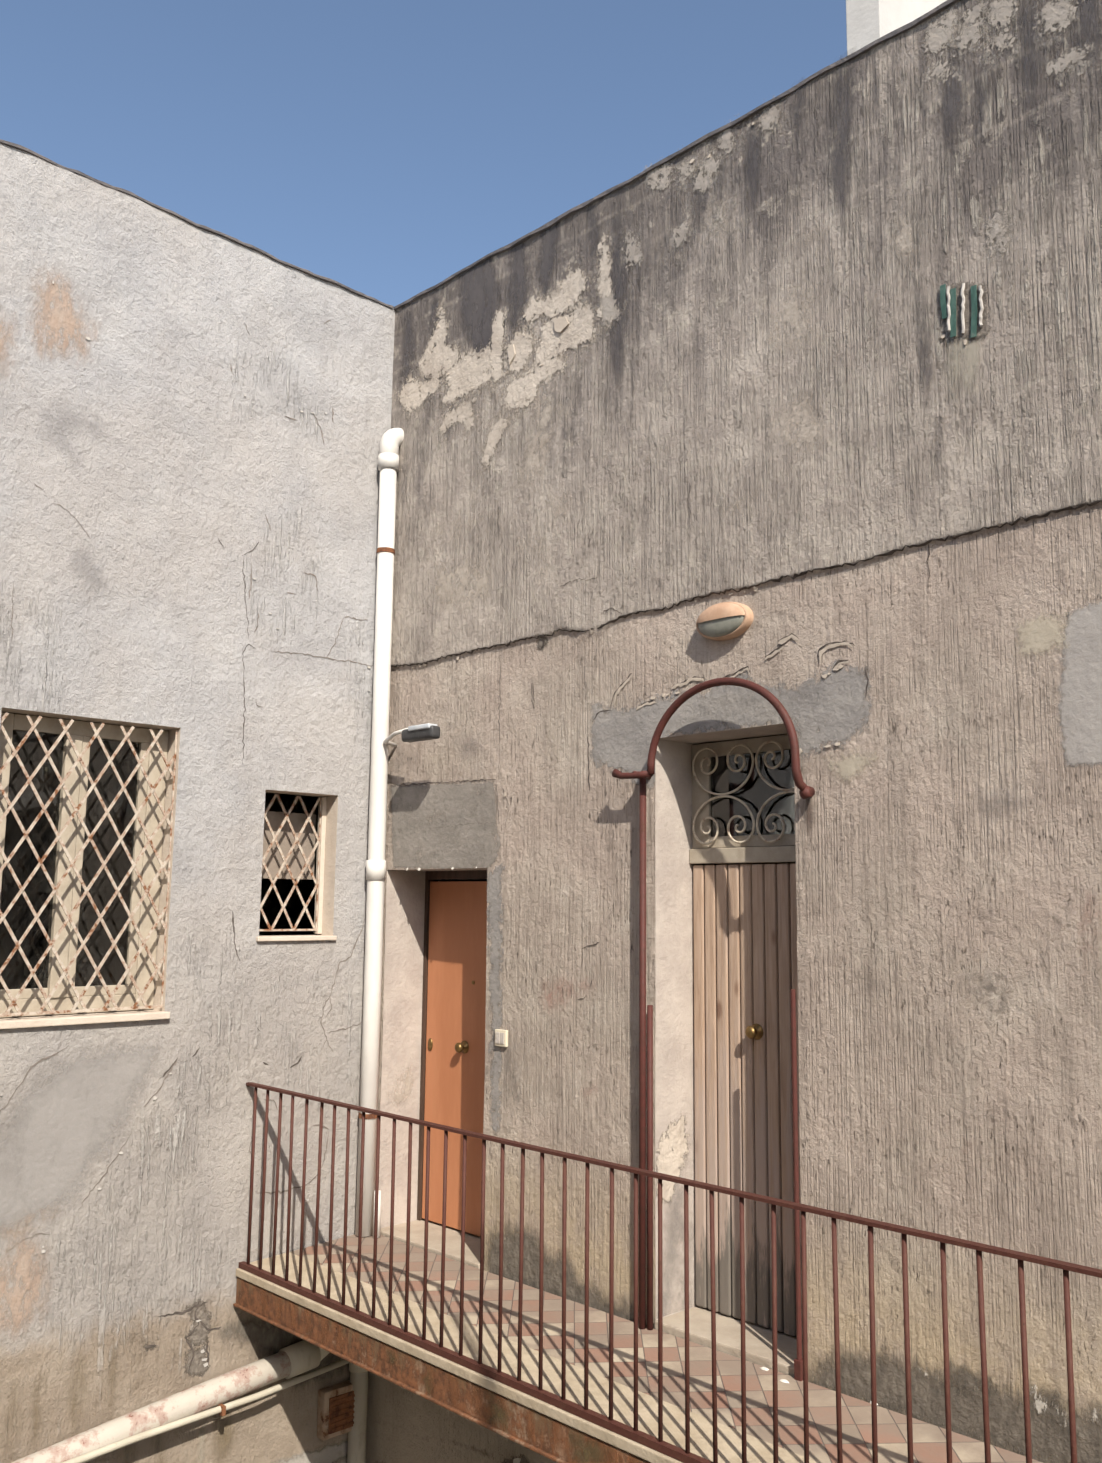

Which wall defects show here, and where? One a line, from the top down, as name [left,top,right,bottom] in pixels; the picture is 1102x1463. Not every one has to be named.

water stain [1077,0,1101,51]
peeling [638,101,785,252]
water stain [747,125,760,205]
water stain [833,64,851,206]
water stain [944,61,984,137]
water stain [590,210,626,377]
peeling [394,223,644,481]
crack [219,500,1102,829]
spalling [159,1300,221,1377]
water stain [224,1320,303,1354]
water stain [296,1353,349,1384]
water stain [810,1352,1102,1463]